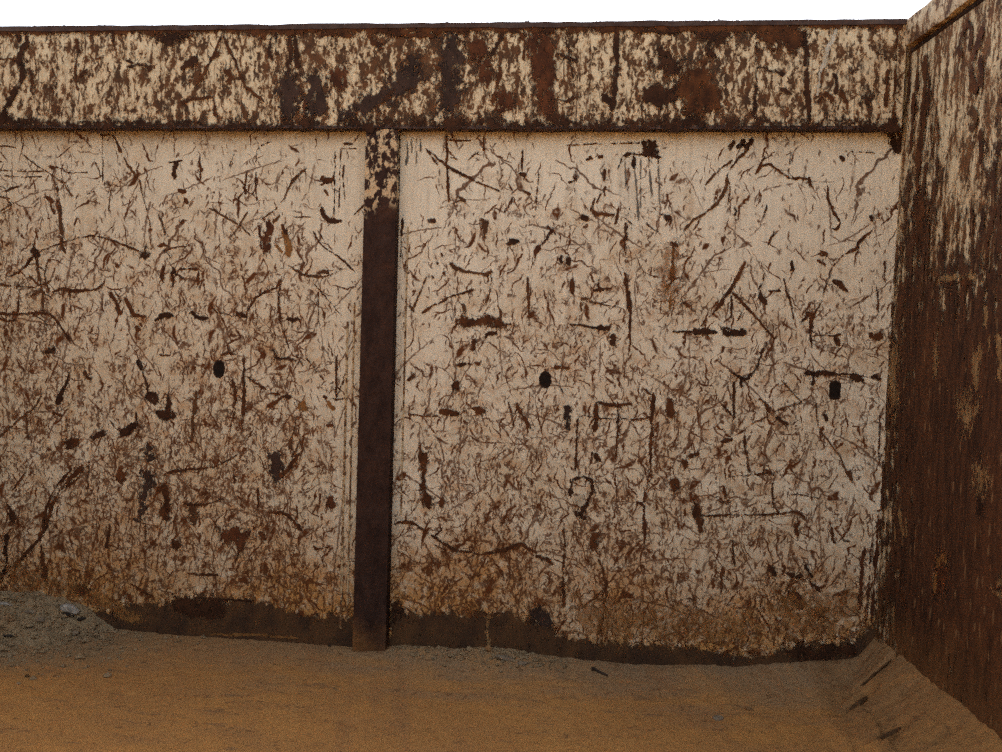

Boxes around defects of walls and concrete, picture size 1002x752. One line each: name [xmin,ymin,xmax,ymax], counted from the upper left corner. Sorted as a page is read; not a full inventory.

corrosion [0,19,905,156]
peeling [816,28,838,96]
corrosion [956,19,986,97]
corrosion [320,175,334,196]
corrosion [45,186,77,254]
corrosion [257,215,293,257]
corrosion [190,391,198,442]
corrosion [389,55,1002,739]
corrosion [115,443,171,543]
corrosion [265,450,300,486]
corrosion [215,525,266,563]
corrosion [93,590,353,647]